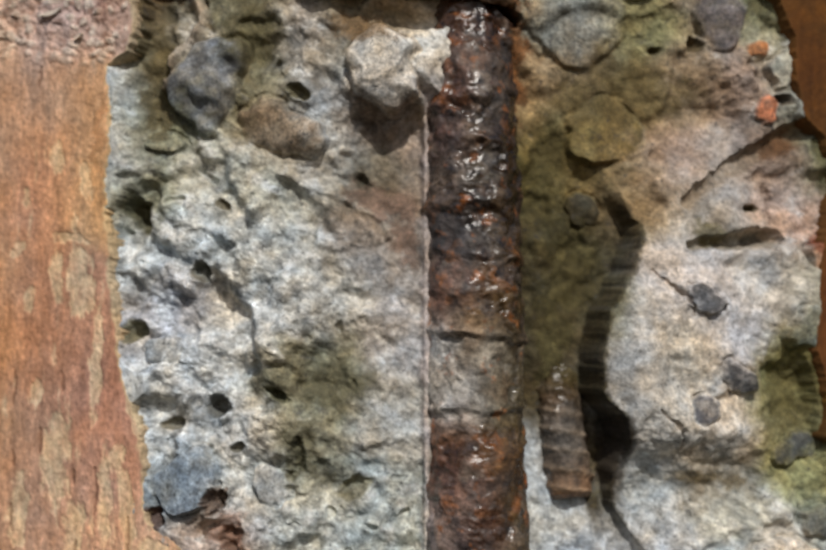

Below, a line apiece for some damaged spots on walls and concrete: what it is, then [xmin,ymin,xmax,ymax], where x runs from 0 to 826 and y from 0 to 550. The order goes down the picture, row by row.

rust [495,1,529,110]
peeling [79,162,95,202]
rust [427,128,477,165]
spalling [97,0,451,550]
spalling [494,0,826,550]
rust [432,442,499,509]